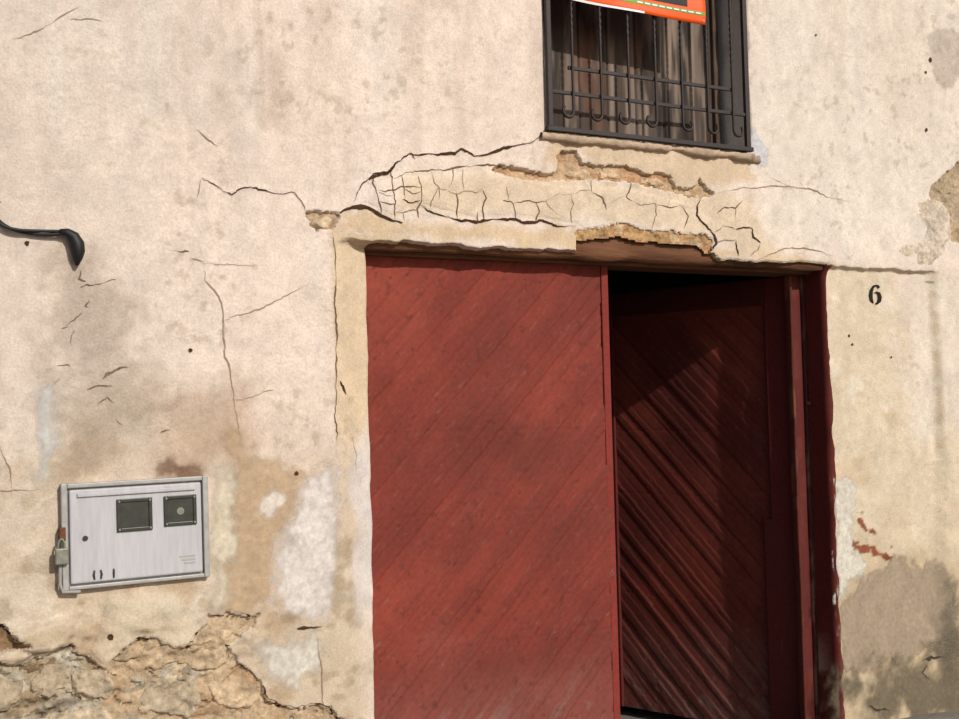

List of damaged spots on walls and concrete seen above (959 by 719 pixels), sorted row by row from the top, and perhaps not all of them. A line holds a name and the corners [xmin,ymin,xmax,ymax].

crack [339,131,846,260]
spalling [492,152,710,198]
spalling [574,223,713,254]
spalling [899,163,959,266]
crack [174,248,307,435]
crack [333,237,357,464]
spalling [0,431,339,719]
peeling [852,542,892,560]
damp [835,603,959,719]